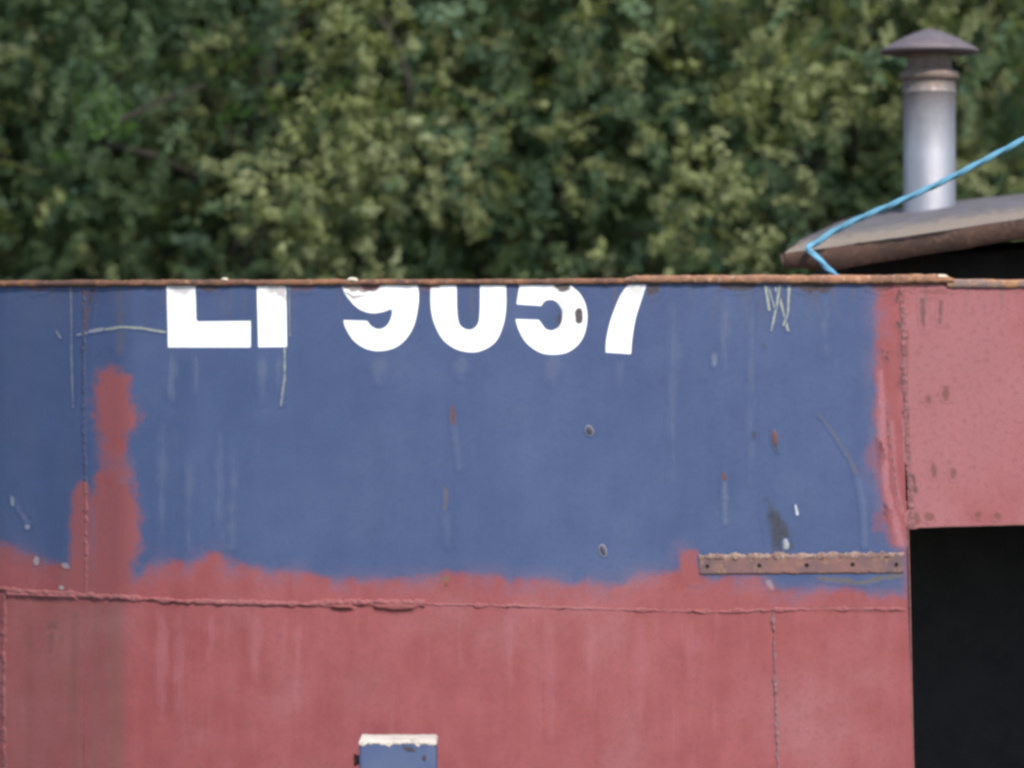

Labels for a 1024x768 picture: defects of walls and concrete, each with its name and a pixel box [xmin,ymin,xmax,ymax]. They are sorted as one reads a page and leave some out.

rust [416,284,443,296]
rust [551,284,576,296]
rust [716,283,761,295]
peeling [74,355,155,605]
peeling [677,545,703,587]